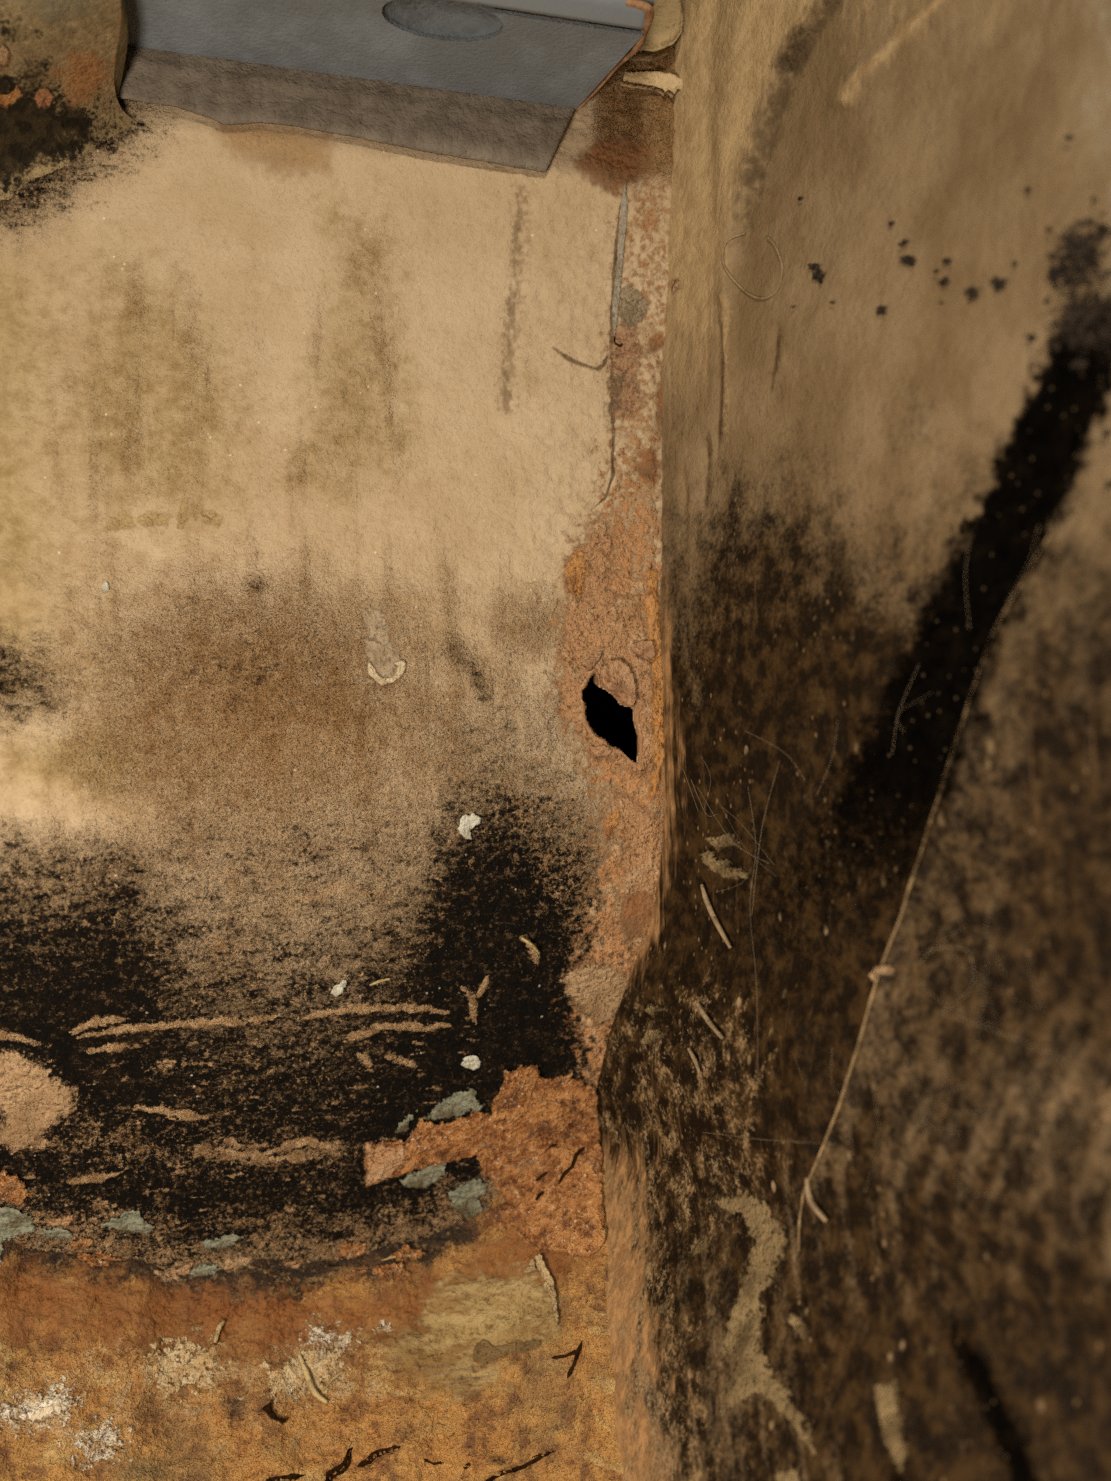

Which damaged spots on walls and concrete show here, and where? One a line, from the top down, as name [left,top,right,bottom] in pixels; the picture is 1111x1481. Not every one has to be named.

corrosion [34,88,53,108]
leakage [773,197,1111,929]
spalling [581,651,637,762]
corrosion [0,136,683,1366]
peeling [395,1055,485,1133]
peeling [400,1163,489,1219]
peeling [0,1204,72,1263]
leakage [143,1326,232,1408]
leakage [259,1313,393,1408]
leakage [0,1375,140,1471]
corrosion [262,1402,288,1424]
crack [266,1445,554,1481]